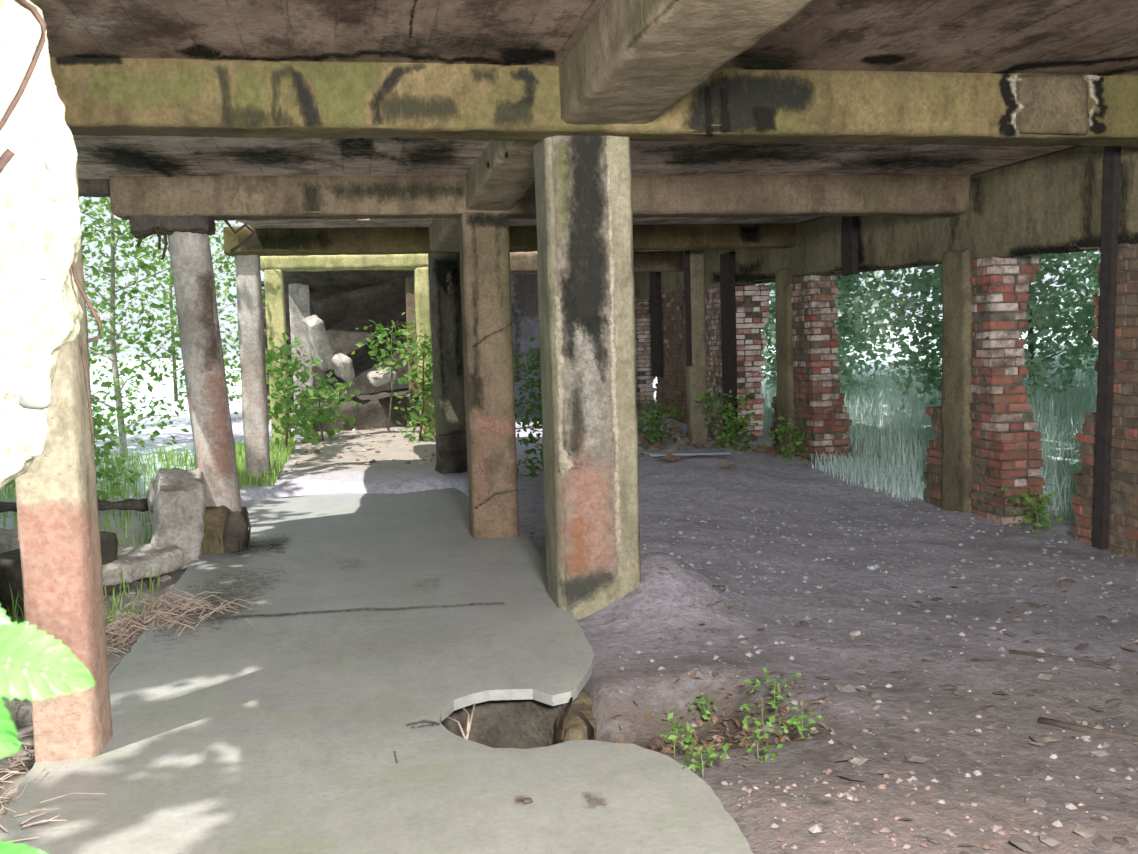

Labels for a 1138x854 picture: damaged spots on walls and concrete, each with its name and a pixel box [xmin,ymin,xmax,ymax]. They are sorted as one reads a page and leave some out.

water stain [216,67,321,130]
water stain [371,34,542,123]
water stain [644,48,973,172]
water stain [87,146,188,177]
water stain [195,138,453,168]
spalling [0,0,102,490]
water stain [562,135,607,379]
water stain [572,388,584,452]
spalling [554,689,597,745]